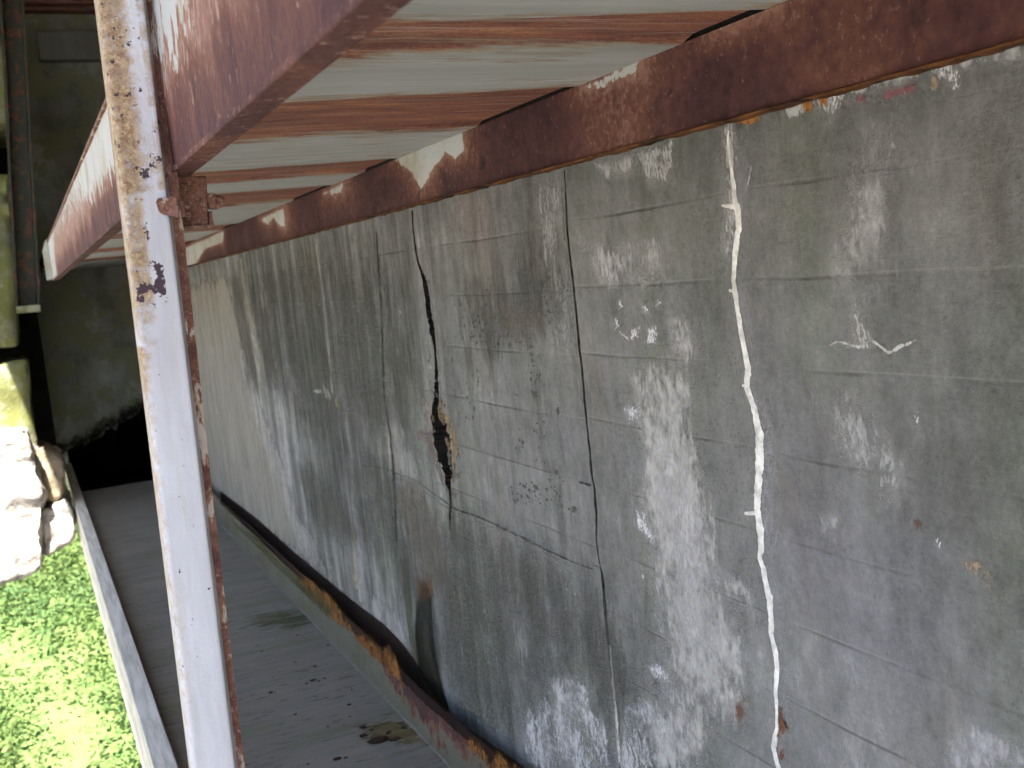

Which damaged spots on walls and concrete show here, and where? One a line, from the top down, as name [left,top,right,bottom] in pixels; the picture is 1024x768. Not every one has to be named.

corrosion [187,38,1024,267]
corrosion [220,499,516,768]
crack [363,170,621,768]
leakage [622,315,751,768]
crack [722,124,781,768]